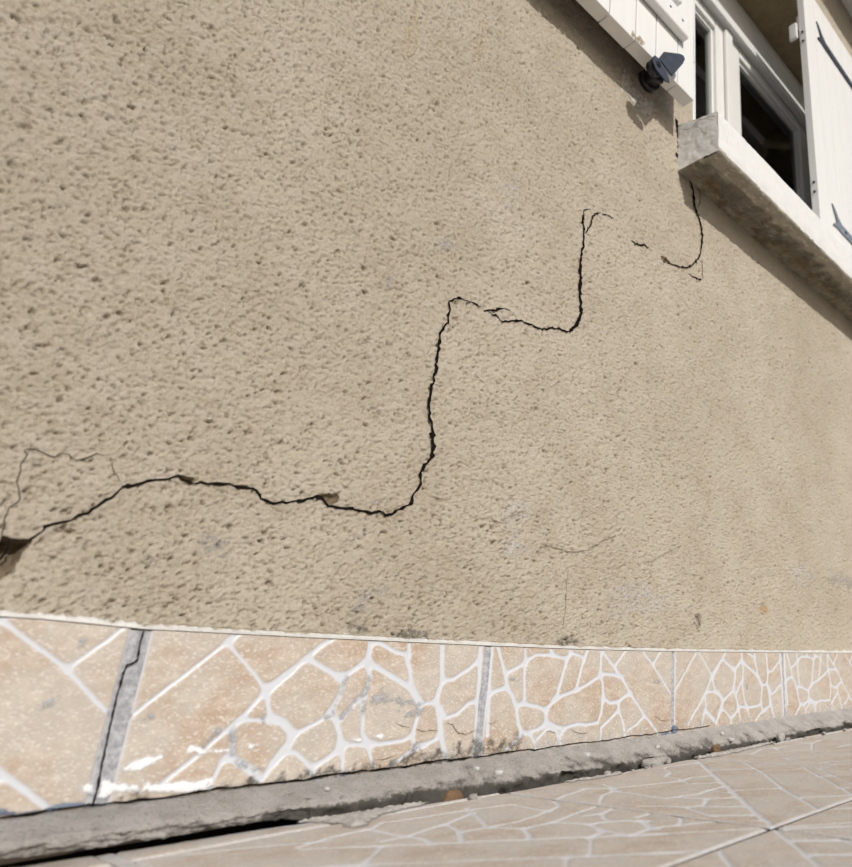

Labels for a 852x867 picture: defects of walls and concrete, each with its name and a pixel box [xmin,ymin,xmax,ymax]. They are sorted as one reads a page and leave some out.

crack [675,116,714,158]
crack [631,180,704,280]
crack [0,209,612,560]
crack [0,535,710,819]
peeling [0,802,84,815]